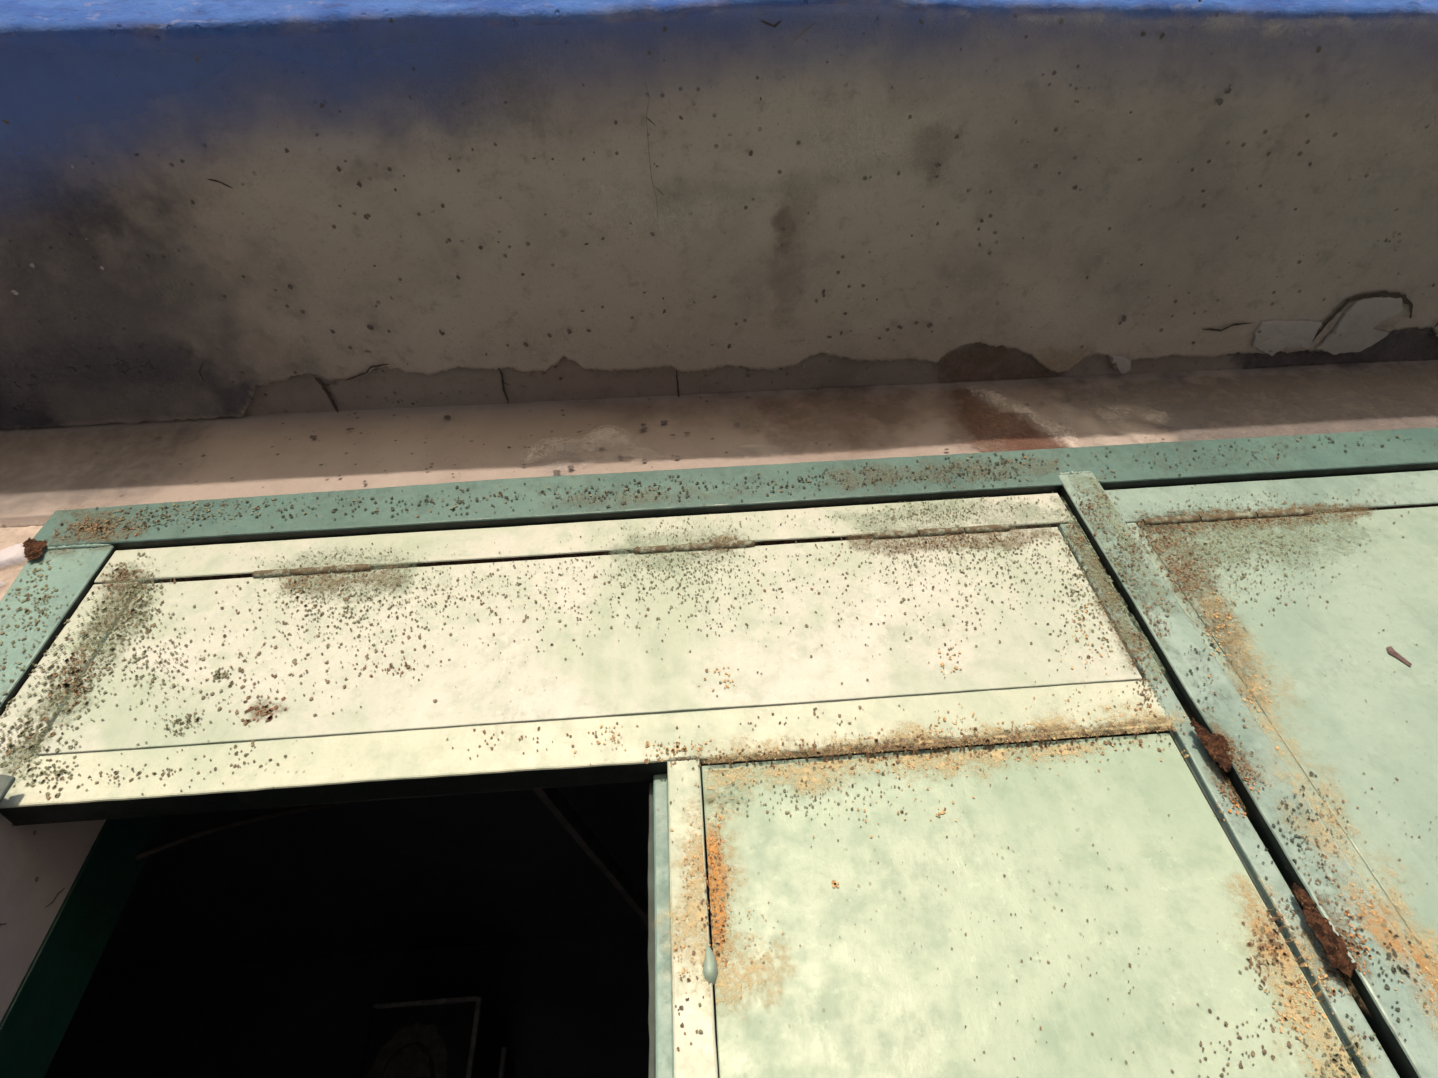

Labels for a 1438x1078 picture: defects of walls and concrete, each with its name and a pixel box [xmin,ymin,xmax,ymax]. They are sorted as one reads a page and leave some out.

peeling [507,420,691,473]
water stain [968,388,1076,448]
water stain [1051,327,1438,441]
corrosion [0,389,1438,1078]